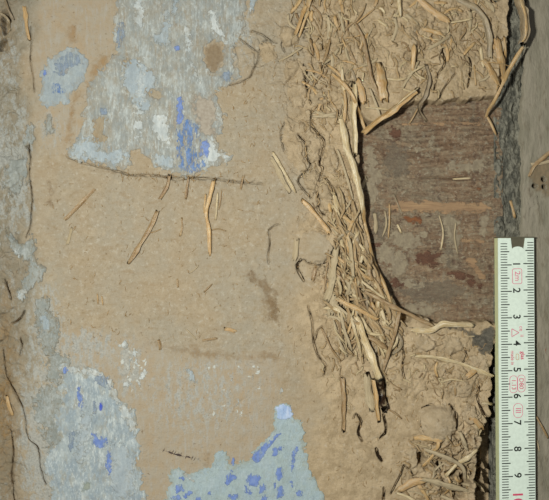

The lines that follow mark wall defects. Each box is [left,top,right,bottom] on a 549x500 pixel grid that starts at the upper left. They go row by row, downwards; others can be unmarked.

peeling [38,0,257,179]
flaking render [281,119,339,211]
crack [8,429,16,500]
crack [3,349,46,483]
peeling [31,296,149,500]
peeling [164,403,325,500]
flaking render [444,380,483,500]